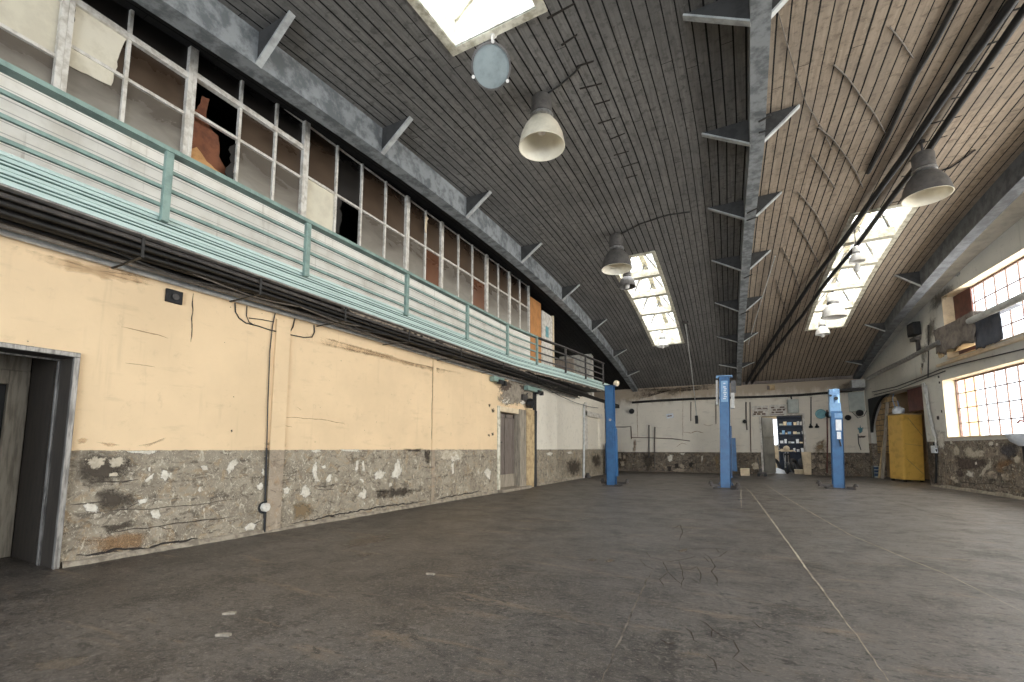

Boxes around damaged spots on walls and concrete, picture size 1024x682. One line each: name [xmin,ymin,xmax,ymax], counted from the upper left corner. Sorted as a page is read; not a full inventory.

peeling [85,451,172,482]
spalling [138,498,161,519]
crack [73,479,261,556]